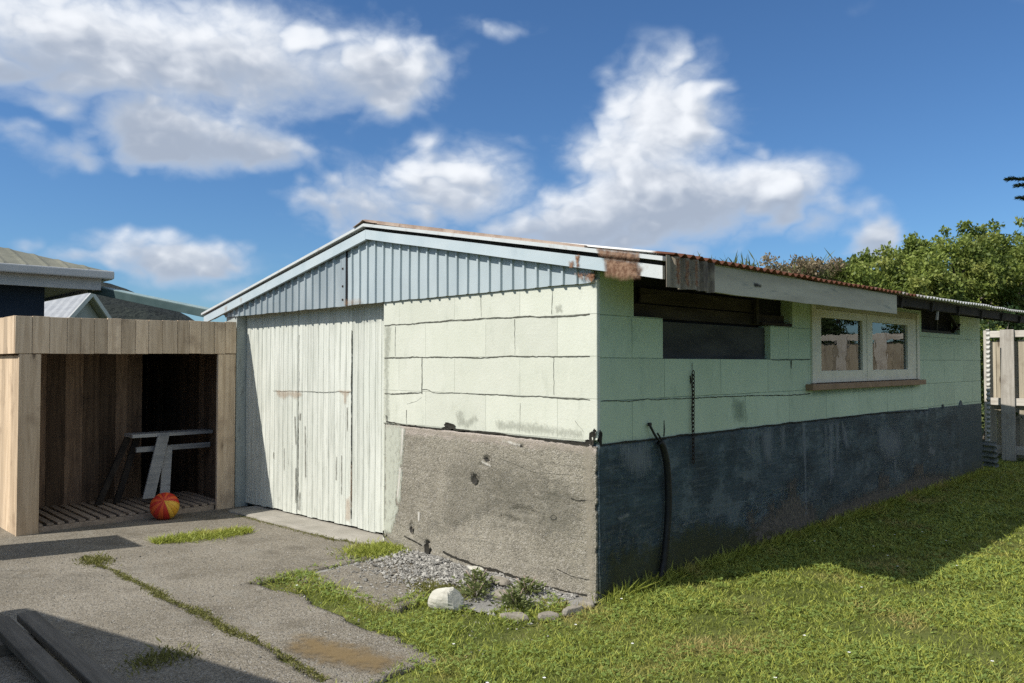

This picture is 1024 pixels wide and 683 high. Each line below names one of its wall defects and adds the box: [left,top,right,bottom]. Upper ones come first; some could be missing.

corrosion [569,249,641,282]